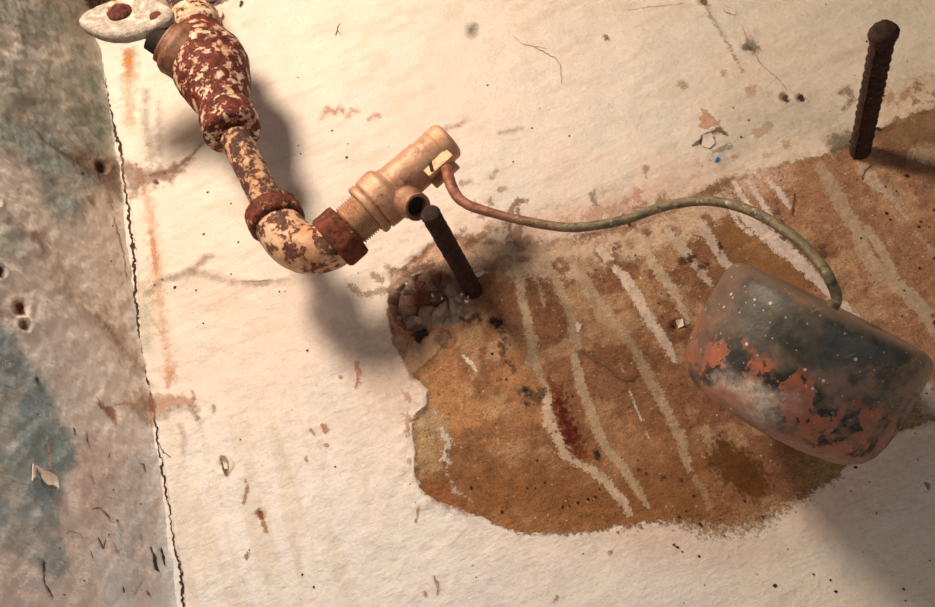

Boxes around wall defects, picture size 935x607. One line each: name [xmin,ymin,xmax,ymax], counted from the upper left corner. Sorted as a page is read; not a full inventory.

spalling [206,0,237,11]
crack [66,81,186,607]
leakage [456,220,647,517]
flaking render [348,19,935,537]
leakage [594,228,692,363]
leakage [586,192,733,286]
leakage [698,174,831,299]
leakage [816,164,935,337]
leakage [920,382,935,416]
leakage [669,468,847,550]